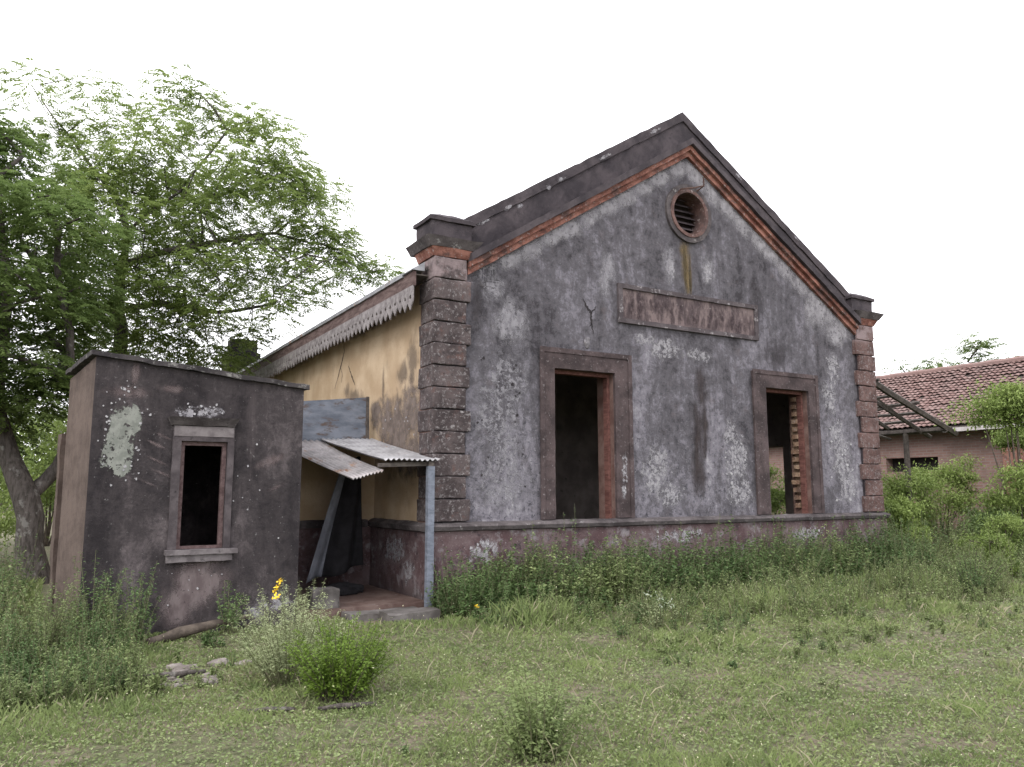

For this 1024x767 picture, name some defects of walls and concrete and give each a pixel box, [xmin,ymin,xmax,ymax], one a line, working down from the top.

crack [583,299,596,334]
peeling [97,380,143,441]
peeling [176,403,224,418]
damp [694,375,707,486]
peeling [469,539,497,563]